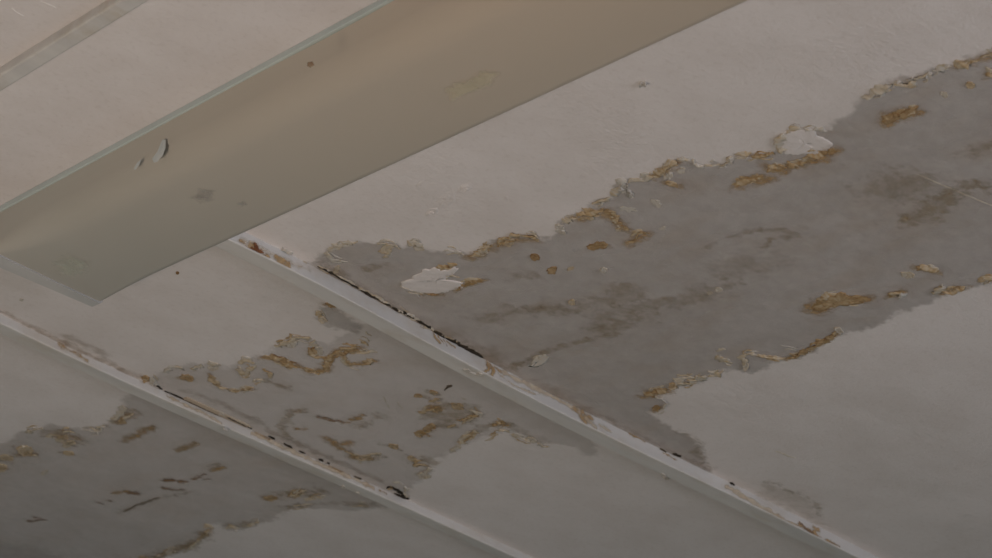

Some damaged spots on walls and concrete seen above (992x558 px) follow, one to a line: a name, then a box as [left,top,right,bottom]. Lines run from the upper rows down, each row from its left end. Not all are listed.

peeling [861,48,992,100]
peeling [881,105,926,128]
peeling [555,124,841,245]
peeling [399,231,574,298]
peeling [586,241,608,251]
peeling [804,290,872,314]
peeling [901,264,966,296]
peeling [140,331,378,393]
peeling [640,326,844,414]
peeling [414,390,550,453]
spalling [386,481,413,500]